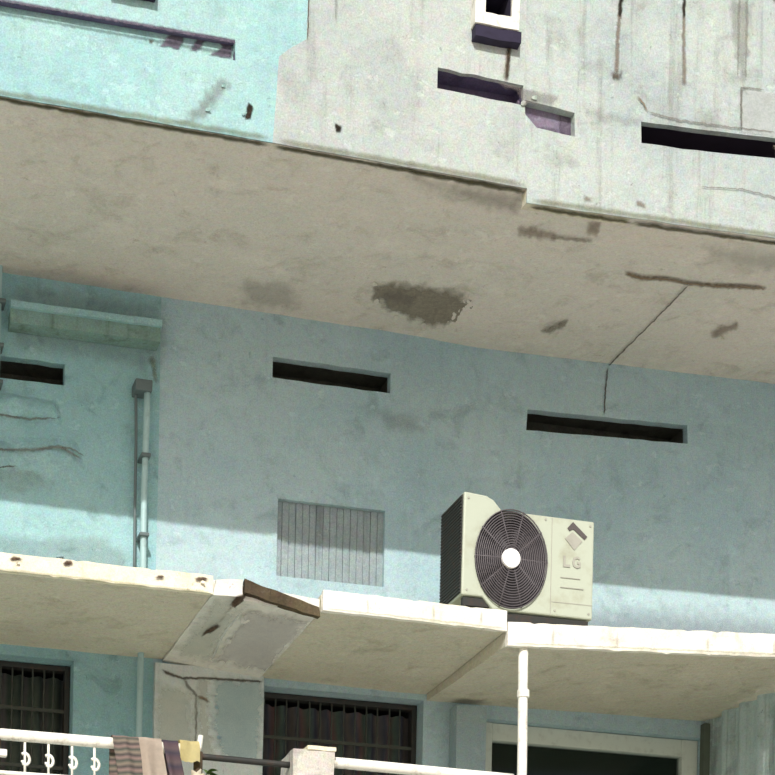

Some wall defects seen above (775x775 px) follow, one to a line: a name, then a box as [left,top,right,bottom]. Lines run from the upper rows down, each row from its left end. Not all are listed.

crack [604,273,765,413]
crack [0,445,82,468]
spalling [229,594,246,610]
crack [163,670,261,741]